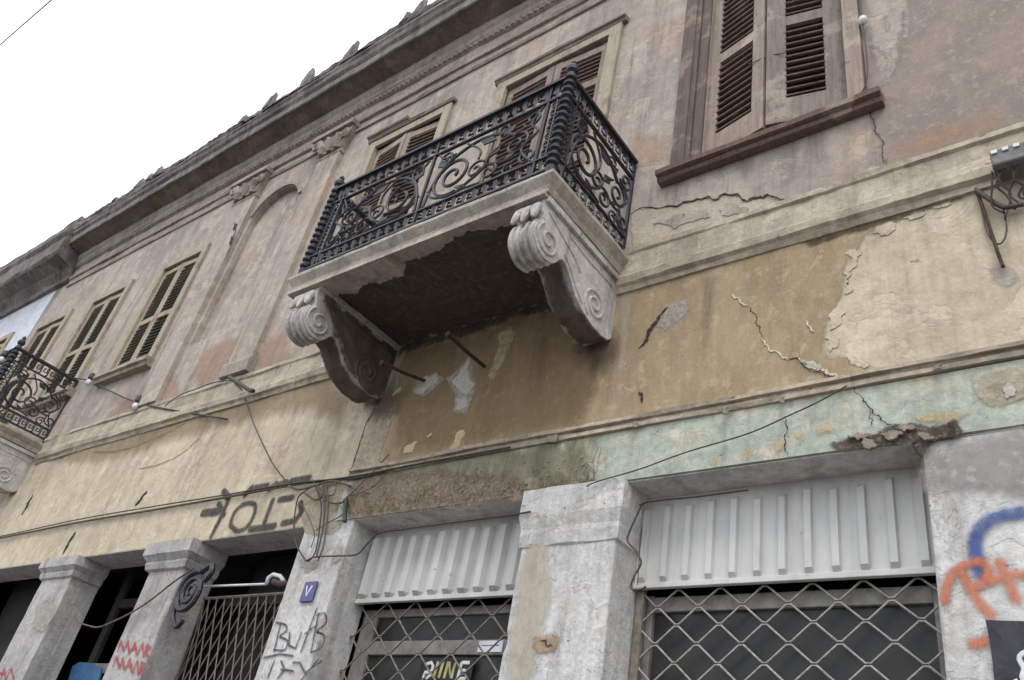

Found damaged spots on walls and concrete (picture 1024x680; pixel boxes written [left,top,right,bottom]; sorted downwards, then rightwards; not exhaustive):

peeling [872,200,952,236]
spalling [287,189,549,345]
peeling [392,358,476,414]
spalling [639,300,688,348]
crack [732,293,893,428]
peeling [825,306,870,368]
peeling [972,364,1024,406]
spalling [816,411,967,467]